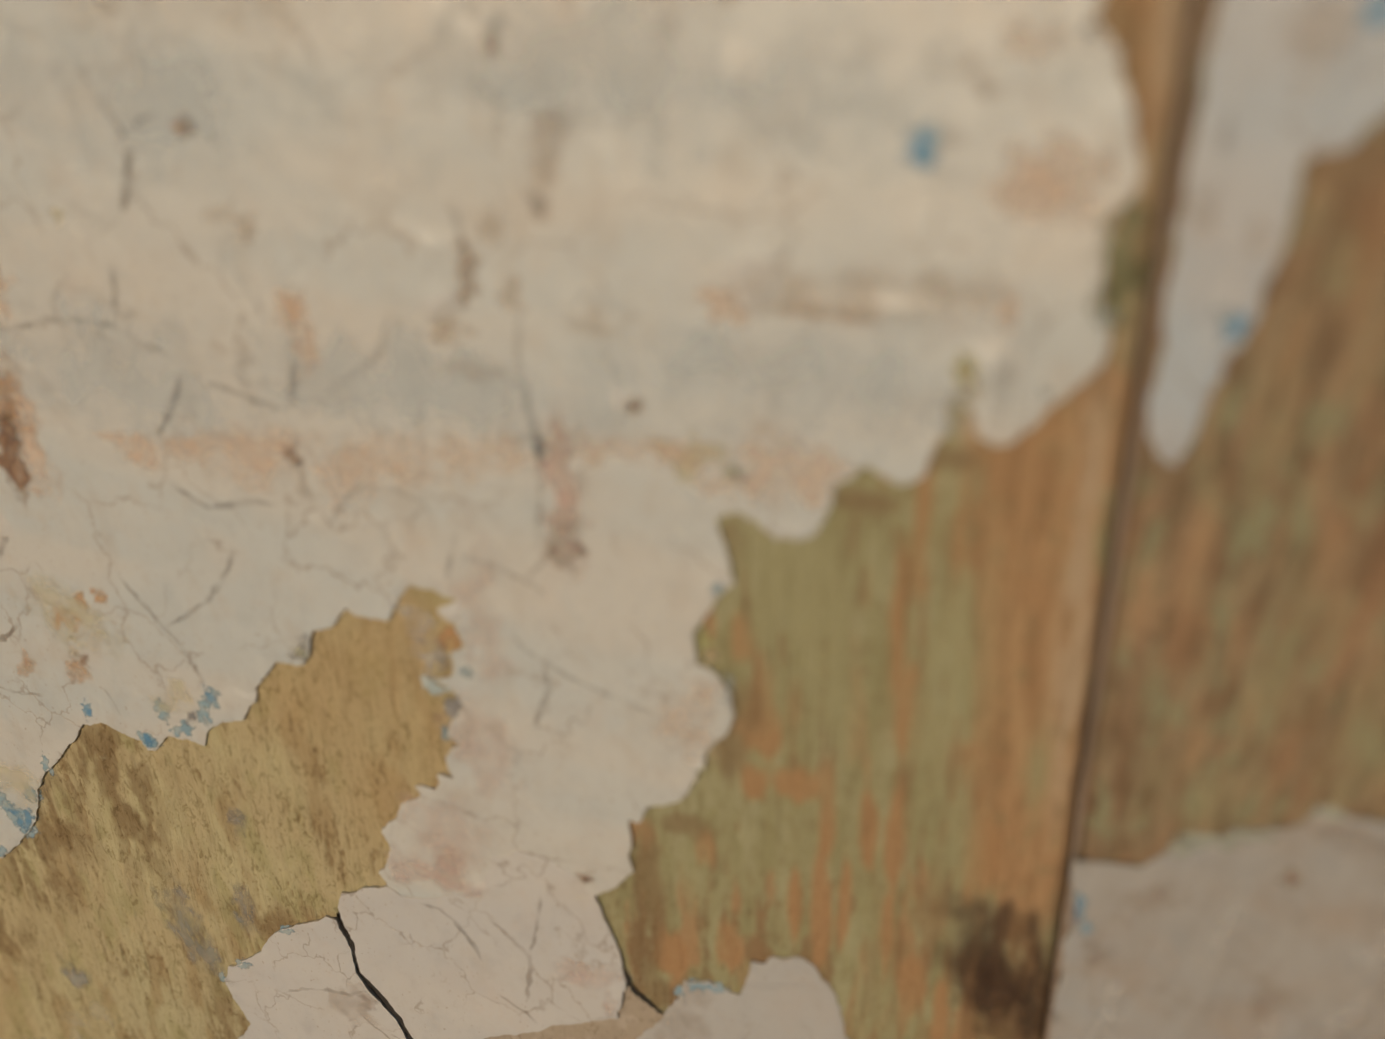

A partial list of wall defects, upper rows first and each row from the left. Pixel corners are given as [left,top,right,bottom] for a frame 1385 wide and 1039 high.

peeling [0,586,464,1039]
crack [341,928,413,1039]
peeling [338,0,1193,1039]
peeling [1078,0,1385,866]